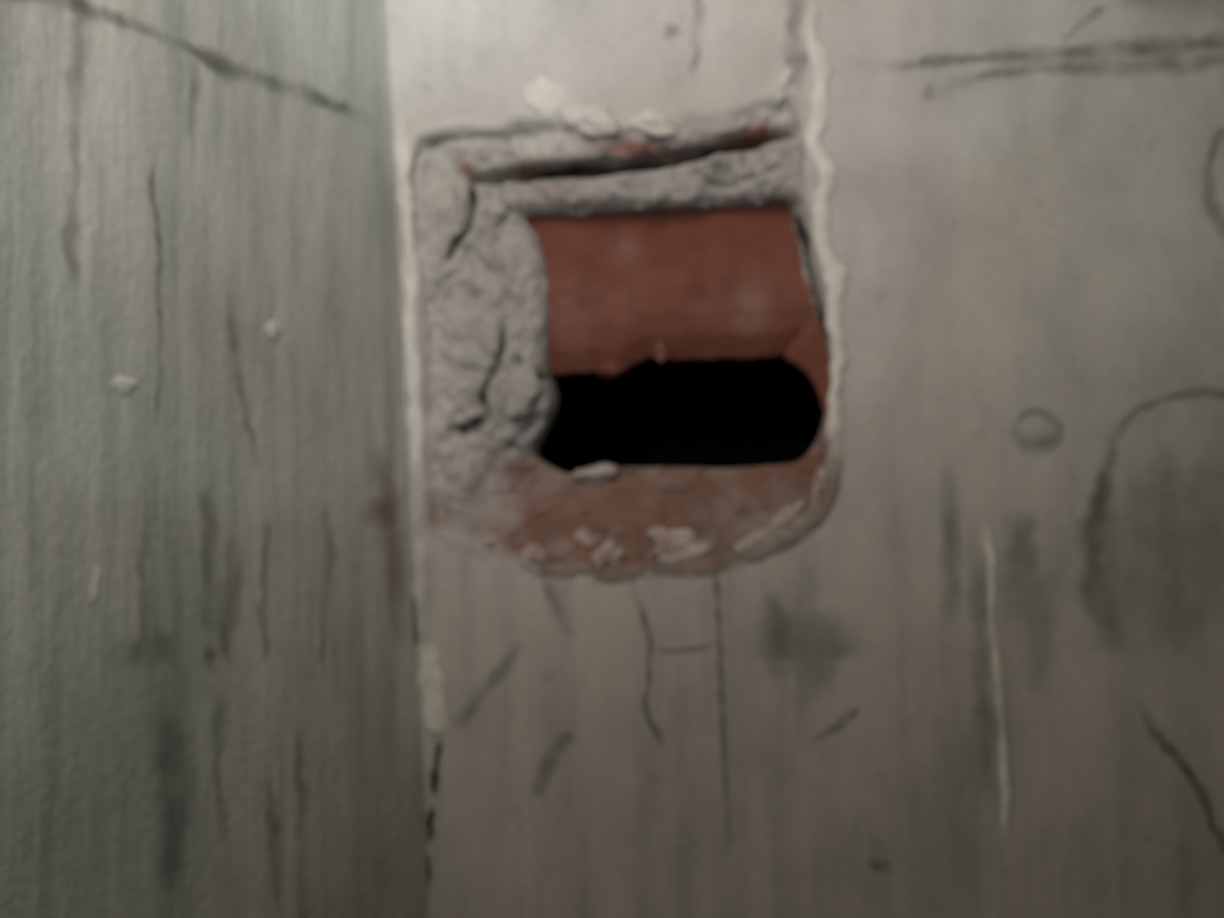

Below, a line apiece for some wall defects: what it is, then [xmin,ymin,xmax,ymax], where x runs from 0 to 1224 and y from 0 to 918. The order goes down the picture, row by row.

spalling [408,66,845,578]